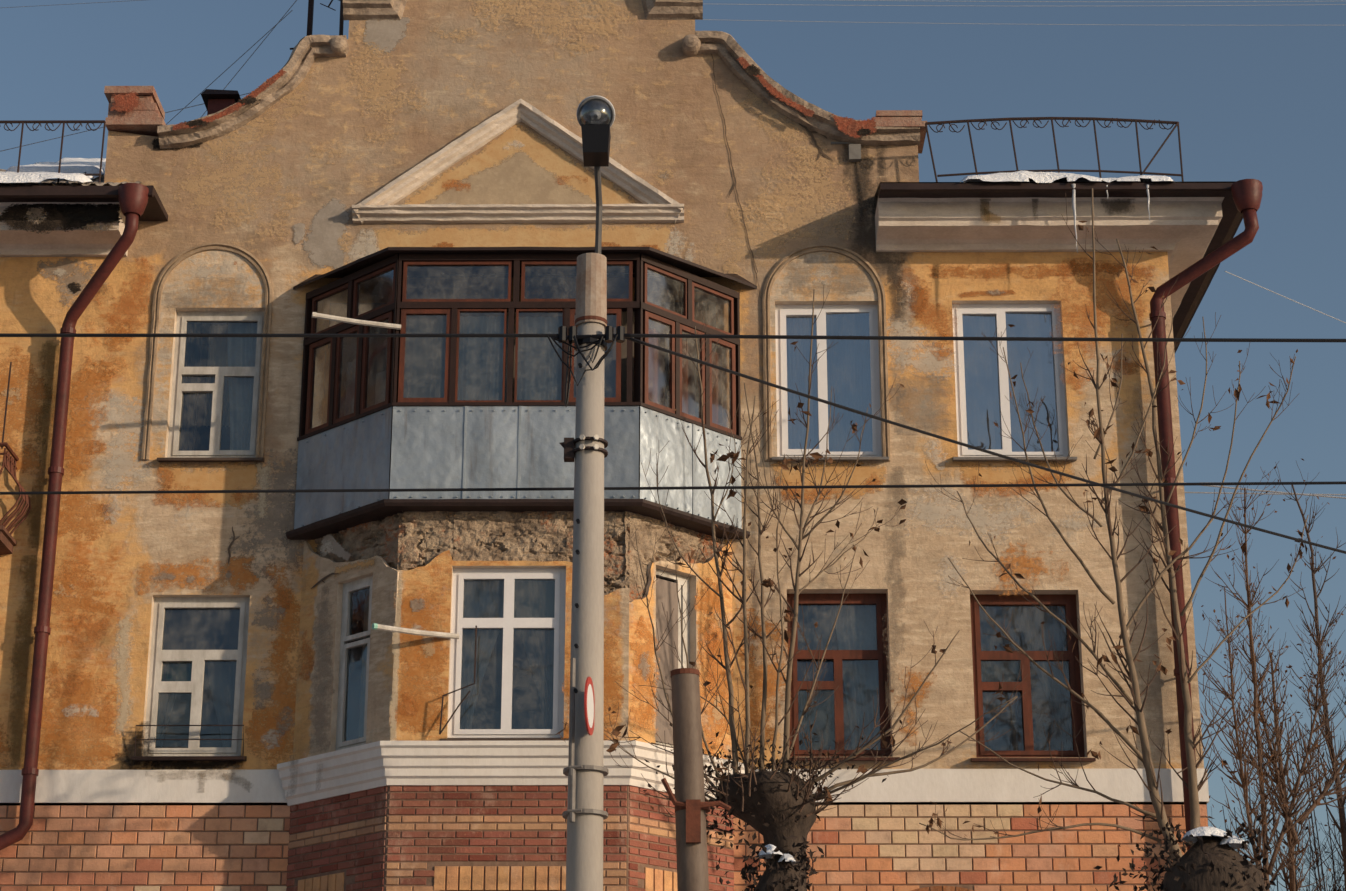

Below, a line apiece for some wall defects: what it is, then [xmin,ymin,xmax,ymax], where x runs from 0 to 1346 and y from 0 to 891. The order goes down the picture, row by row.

crack [711,54,761,298]
damp [10,343,60,765]
spalling [136,489,574,766]